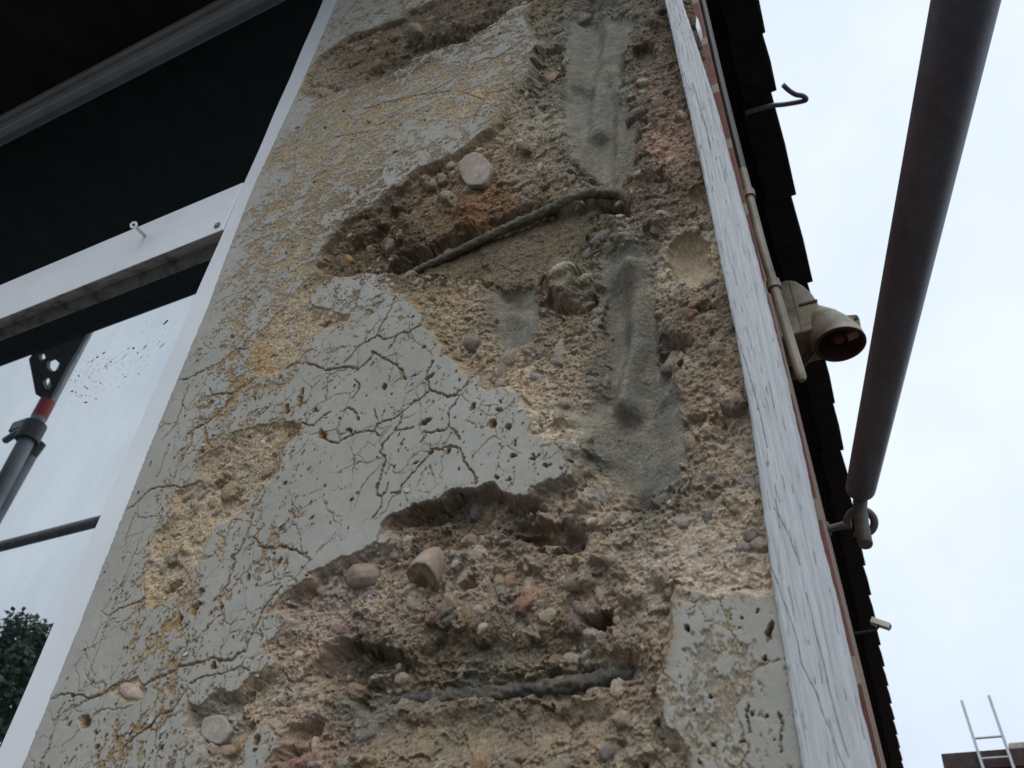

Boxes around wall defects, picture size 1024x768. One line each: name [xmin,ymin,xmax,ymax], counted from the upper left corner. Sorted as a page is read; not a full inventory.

crack [38,347,283,768]
crack [213,484,308,603]
crack [284,271,478,519]
spalling [33,0,788,768]